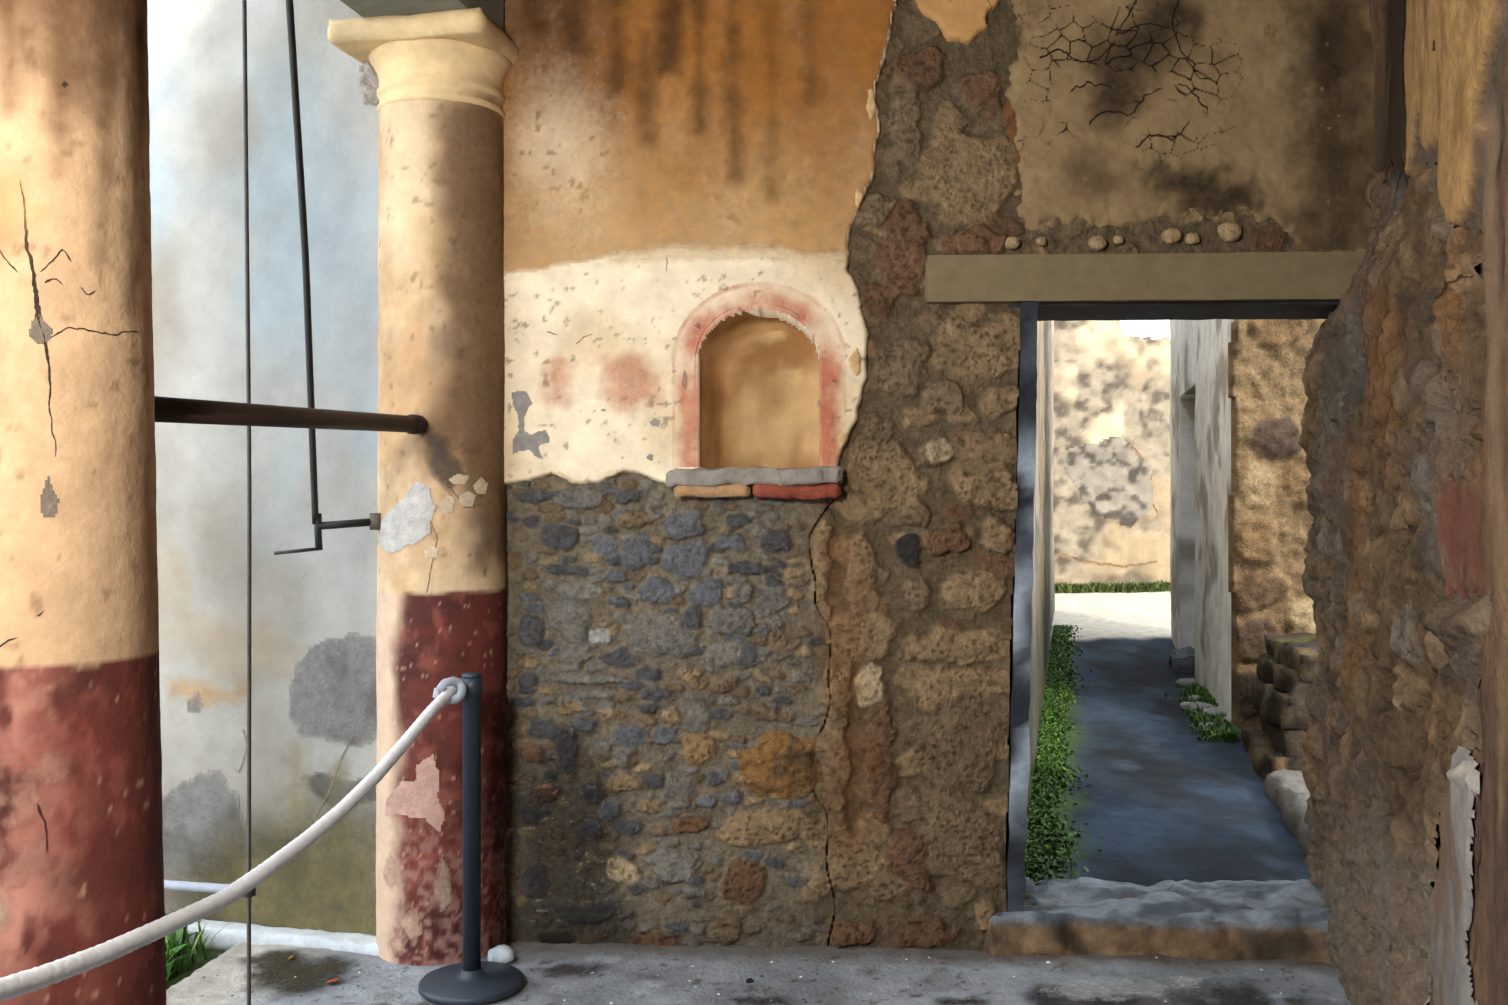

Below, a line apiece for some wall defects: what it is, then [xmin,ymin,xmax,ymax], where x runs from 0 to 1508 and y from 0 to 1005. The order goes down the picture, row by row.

crack [988,0,1243,159]
crack [0,182,138,457]
water stain [426,0,897,559]
spalling [378,0,1304,952]
spalling [1299,161,1489,1005]
spalling [289,632,377,747]
peeling [300,754,445,832]
water stain [544,964,601,976]
water stain [735,997,784,1005]
water stain [939,997,985,1005]
water stain [1027,982,1269,1005]